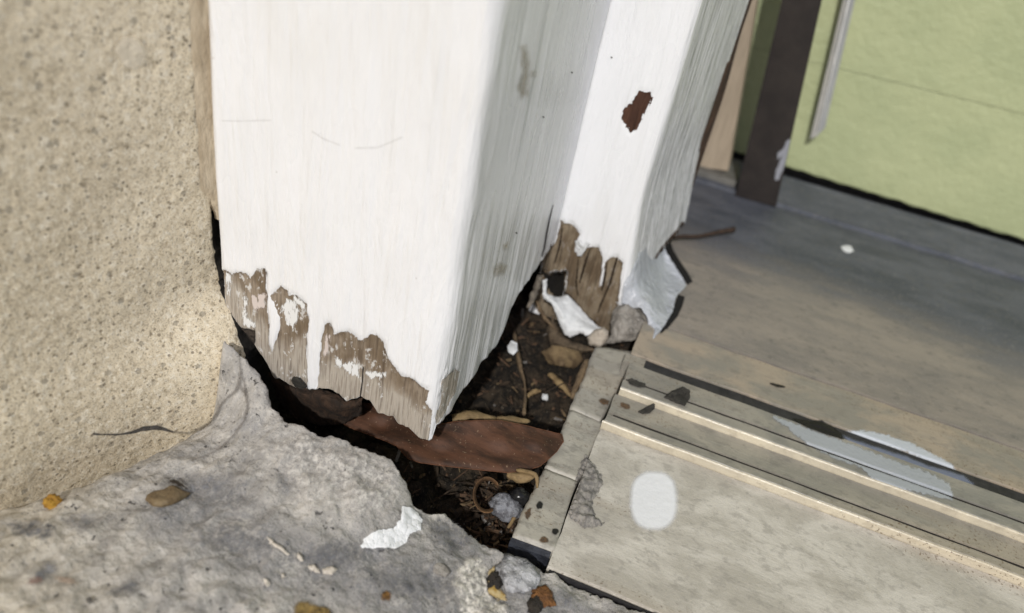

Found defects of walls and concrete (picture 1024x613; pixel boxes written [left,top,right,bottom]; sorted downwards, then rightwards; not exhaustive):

peeling [622,91,653,133]
peeling [534,220,623,337]
peeling [223,268,460,440]
crack [94,425,173,435]